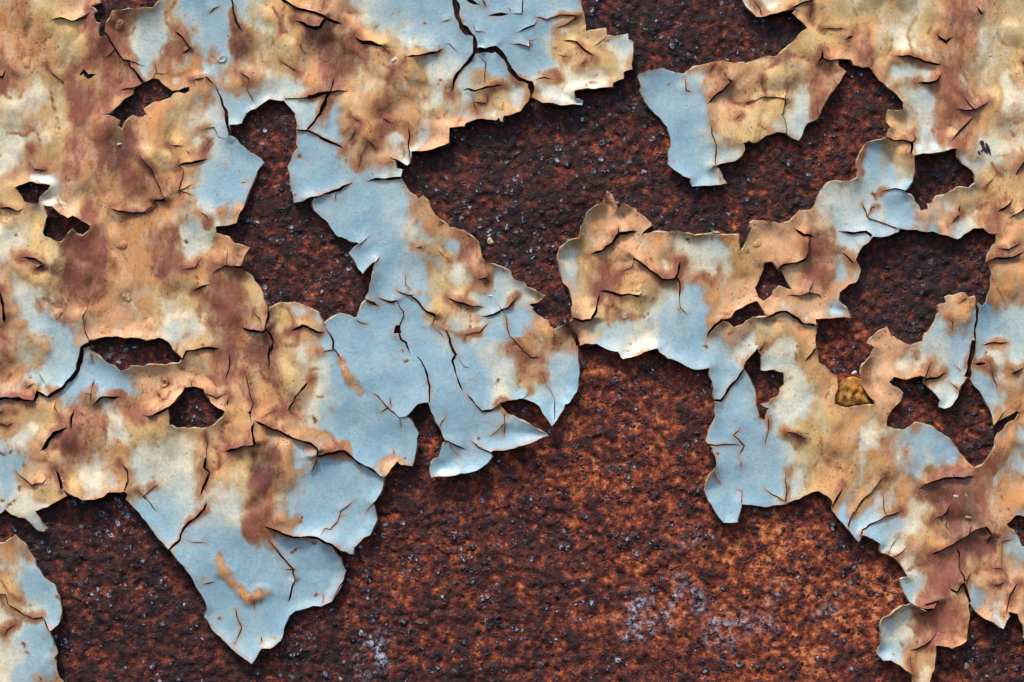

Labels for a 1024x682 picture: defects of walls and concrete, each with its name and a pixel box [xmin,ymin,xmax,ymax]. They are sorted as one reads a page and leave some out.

peeling [0,534,64,682]
peeling [0,72,87,277]
crack [0,302,121,489]
corrosion [0,0,374,547]
crack [143,347,382,550]
crack [281,0,606,113]
corrosion [0,314,912,682]
crack [357,226,686,455]
corrosion [397,0,903,420]
peeling [637,61,846,187]
peeling [776,0,1024,490]
corrosion [777,83,1024,561]